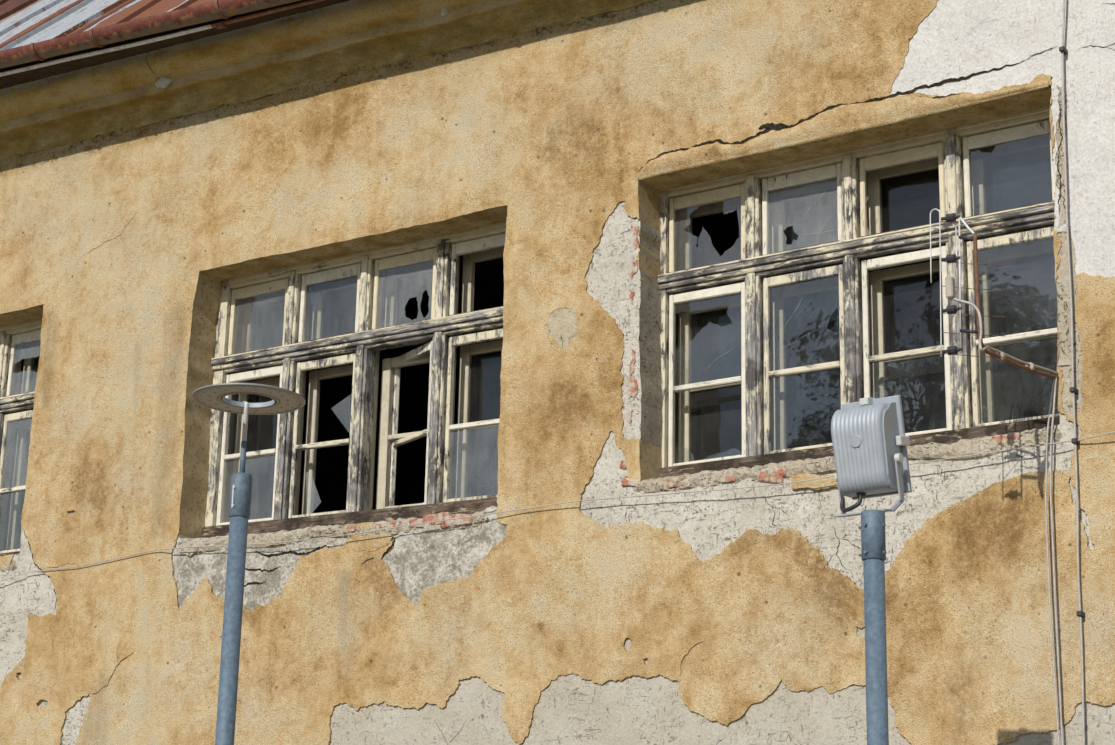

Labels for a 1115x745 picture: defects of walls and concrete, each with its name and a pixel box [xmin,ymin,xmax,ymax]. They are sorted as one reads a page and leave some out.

crack [638,43,1115,172]
flaking render [890,0,1115,277]
flaking render [545,308,578,349]
flaking render [580,202,1082,589]
flaking render [0,526,57,687]
flaking render [172,534,229,608]
flaking render [243,508,507,610]
flaking render [61,696,90,745]
flaking render [330,659,867,745]
flaking render [888,696,911,745]
flaking render [998,702,1115,745]